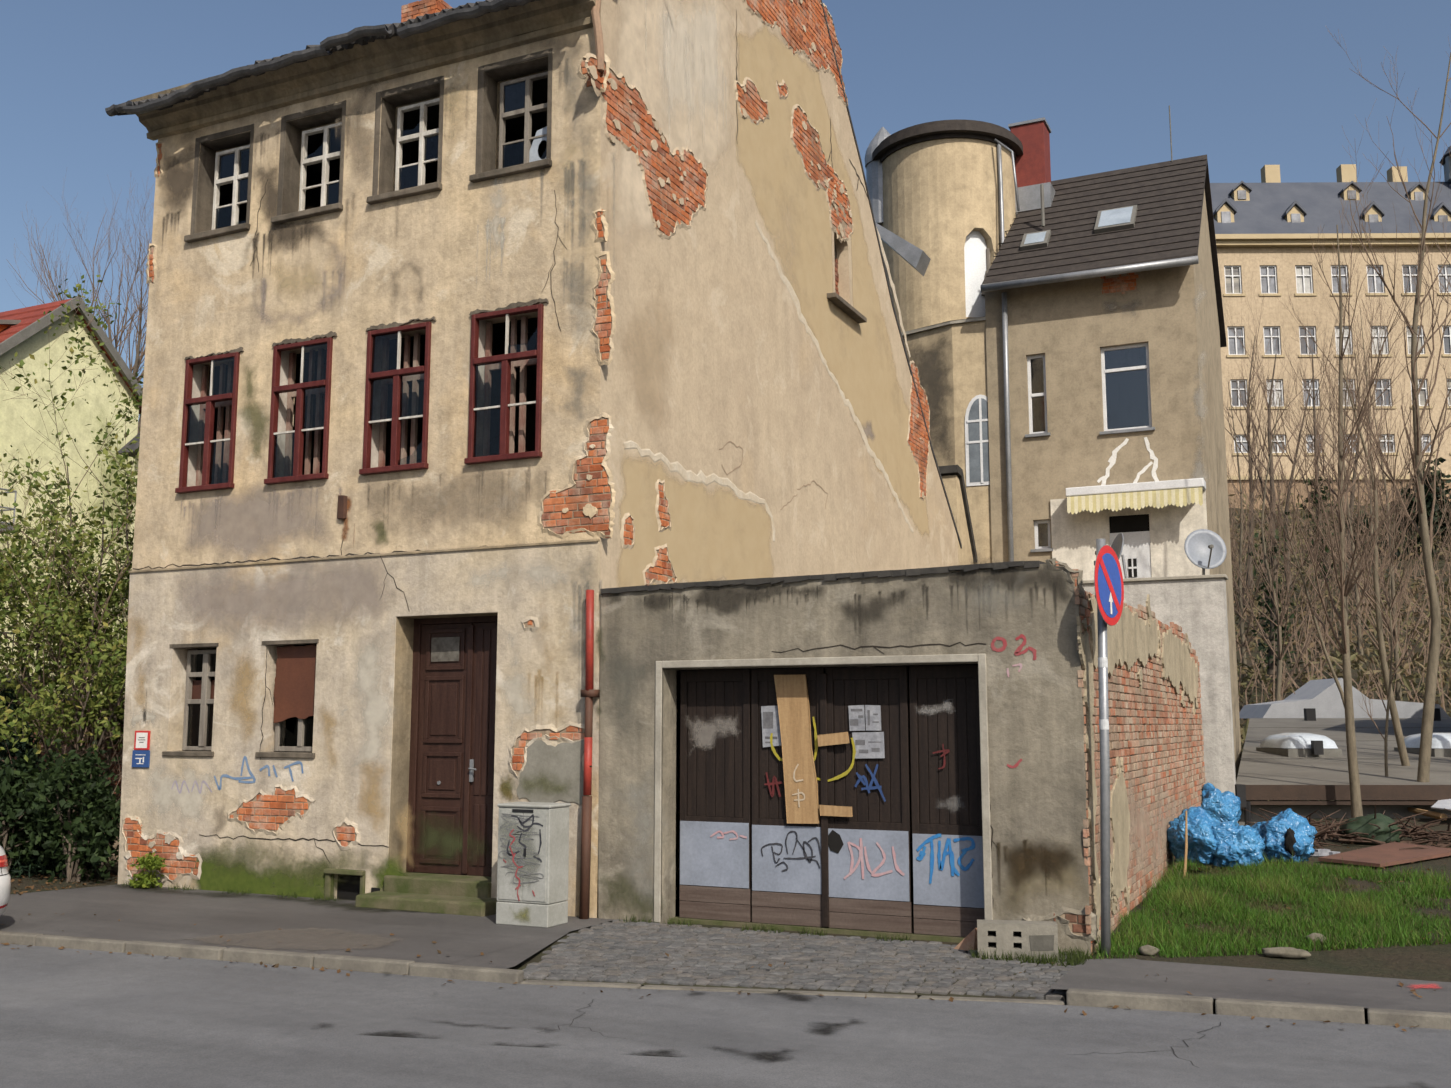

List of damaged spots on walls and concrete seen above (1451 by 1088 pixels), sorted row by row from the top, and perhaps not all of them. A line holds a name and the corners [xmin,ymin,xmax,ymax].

spalling [742,0,848,106]
water stain [163,158,194,230]
spalling [577,52,708,240]
spalling [734,77,854,243]
crack [542,190,567,331]
spalling [537,412,635,550]
water stain [644,585,822,613]
water stain [845,591,904,620]
flaking render [1023,558,1199,951]
spalling [121,813,203,884]
spalling [227,784,316,836]
water stain [997,840,1071,884]